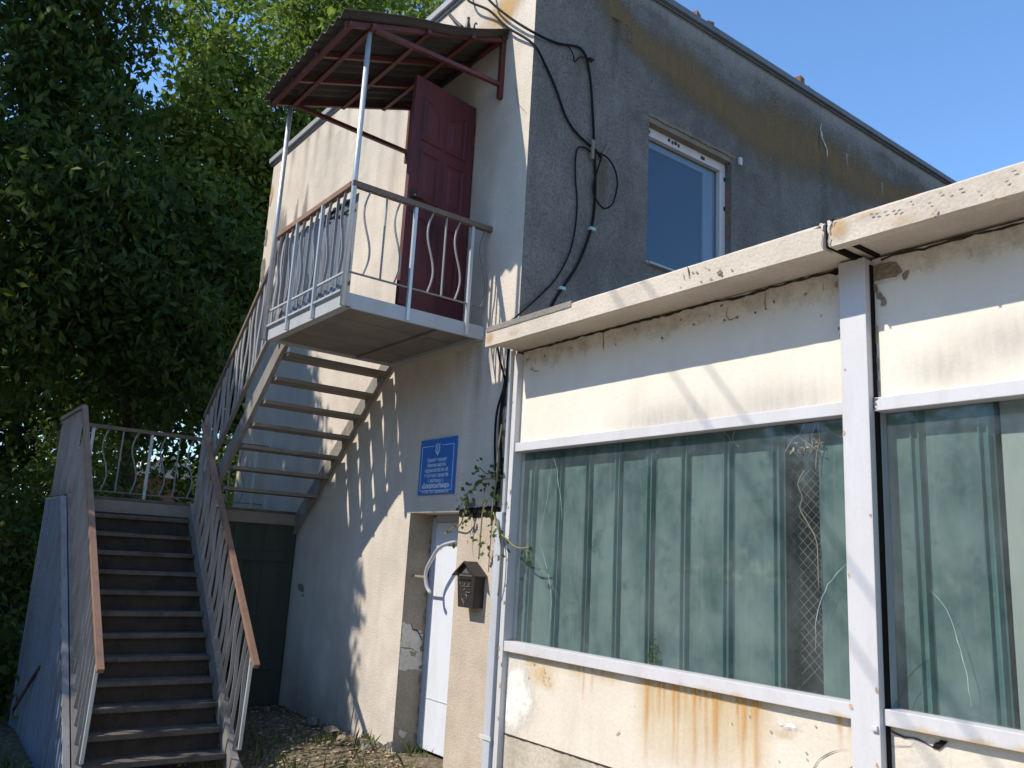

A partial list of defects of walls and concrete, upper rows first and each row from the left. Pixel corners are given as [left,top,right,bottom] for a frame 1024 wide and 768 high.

spalling [873,262,909,306]
flaking render [361,567,430,752]
corrosion [693,688,717,731]